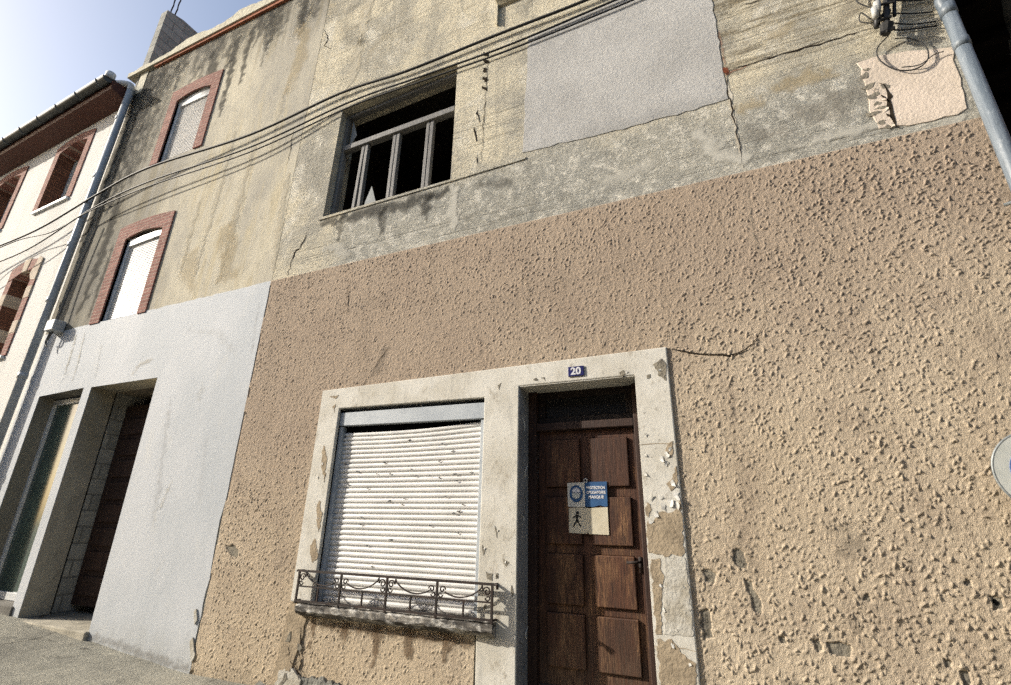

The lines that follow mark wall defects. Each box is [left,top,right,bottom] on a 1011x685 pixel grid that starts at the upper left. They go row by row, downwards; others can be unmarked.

water stain [197,5,283,116]
crack [473,48,490,163]
flaking render [856,47,967,129]
crack [667,27,873,357]
peeling [645,441,713,685]
flaking render [702,569,716,584]
flaking render [733,549,747,568]
flaking render [745,580,762,614]
spalling [275,630,302,685]
flaking render [813,639,851,657]